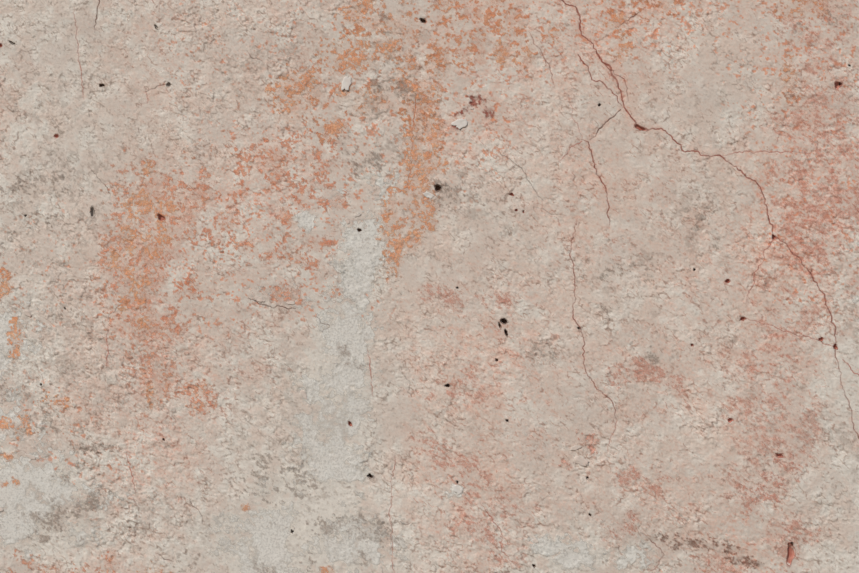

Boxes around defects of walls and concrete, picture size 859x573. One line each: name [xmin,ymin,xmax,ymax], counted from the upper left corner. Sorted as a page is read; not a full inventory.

peeling [330,75,352,97]
crack [562,0,859,375]
peeling [0,293,130,546]